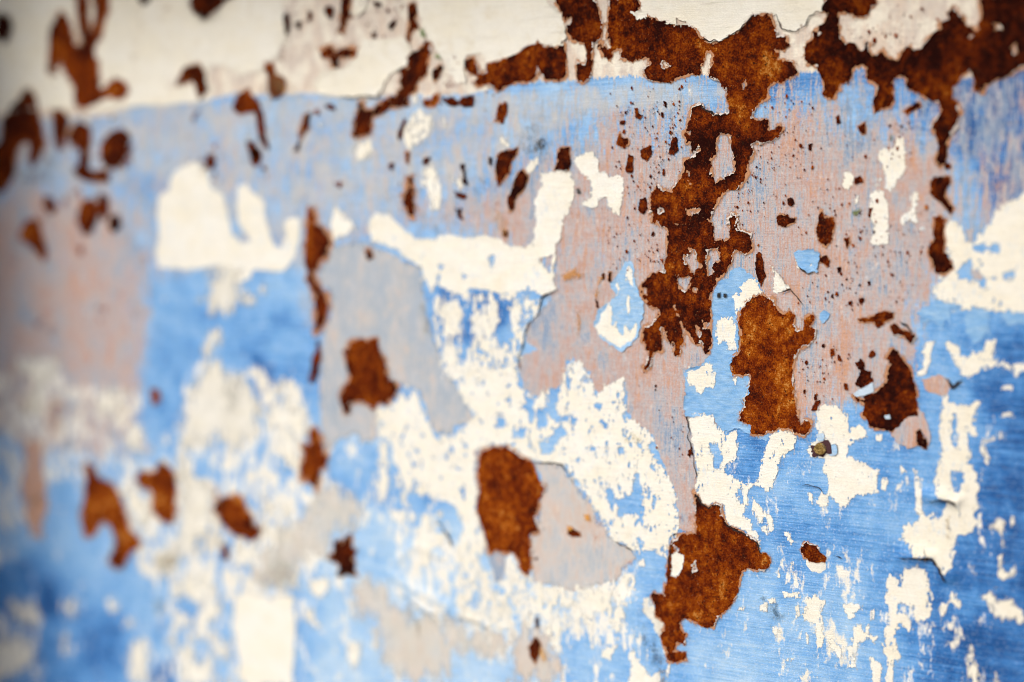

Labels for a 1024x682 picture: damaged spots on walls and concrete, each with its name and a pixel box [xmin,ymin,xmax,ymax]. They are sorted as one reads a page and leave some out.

corrosion [188,144,222,182]
corrosion [232,0,1024,438]
peeling [154,151,797,682]
corrosion [476,445,547,576]
corrosion [650,489,771,664]
peeling [760,339,1024,682]